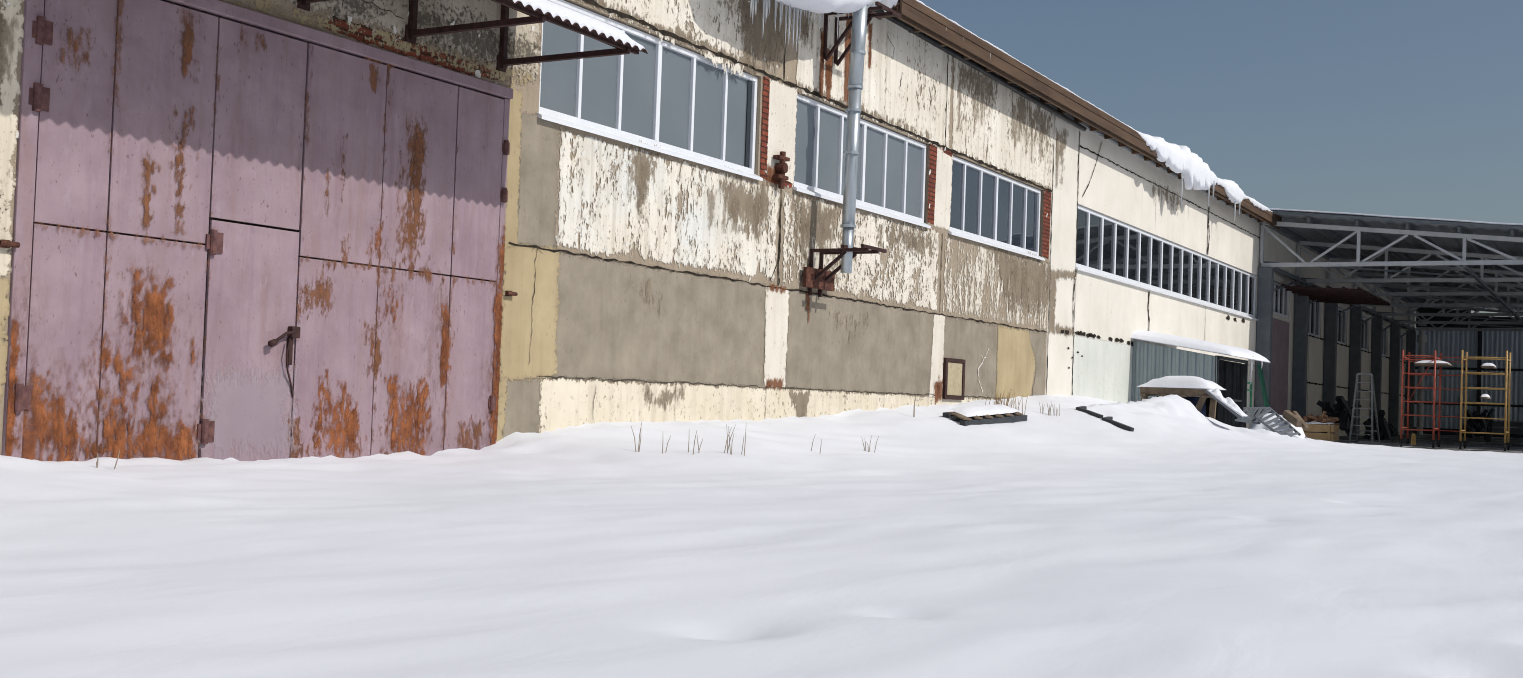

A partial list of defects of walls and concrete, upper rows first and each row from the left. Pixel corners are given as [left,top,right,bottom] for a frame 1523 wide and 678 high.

corrosion [182,10,218,77]
peeling [283,0,542,84]
damp [577,0,813,76]
peeling [0,0,25,280]
corrosion [5,221,201,462]
corrosion [136,107,202,248]
corrosion [287,114,506,458]
damp [629,140,660,220]
damp [709,168,774,241]
damp [793,190,839,261]
peeling [555,0,1133,369]
damp [958,64,1069,186]